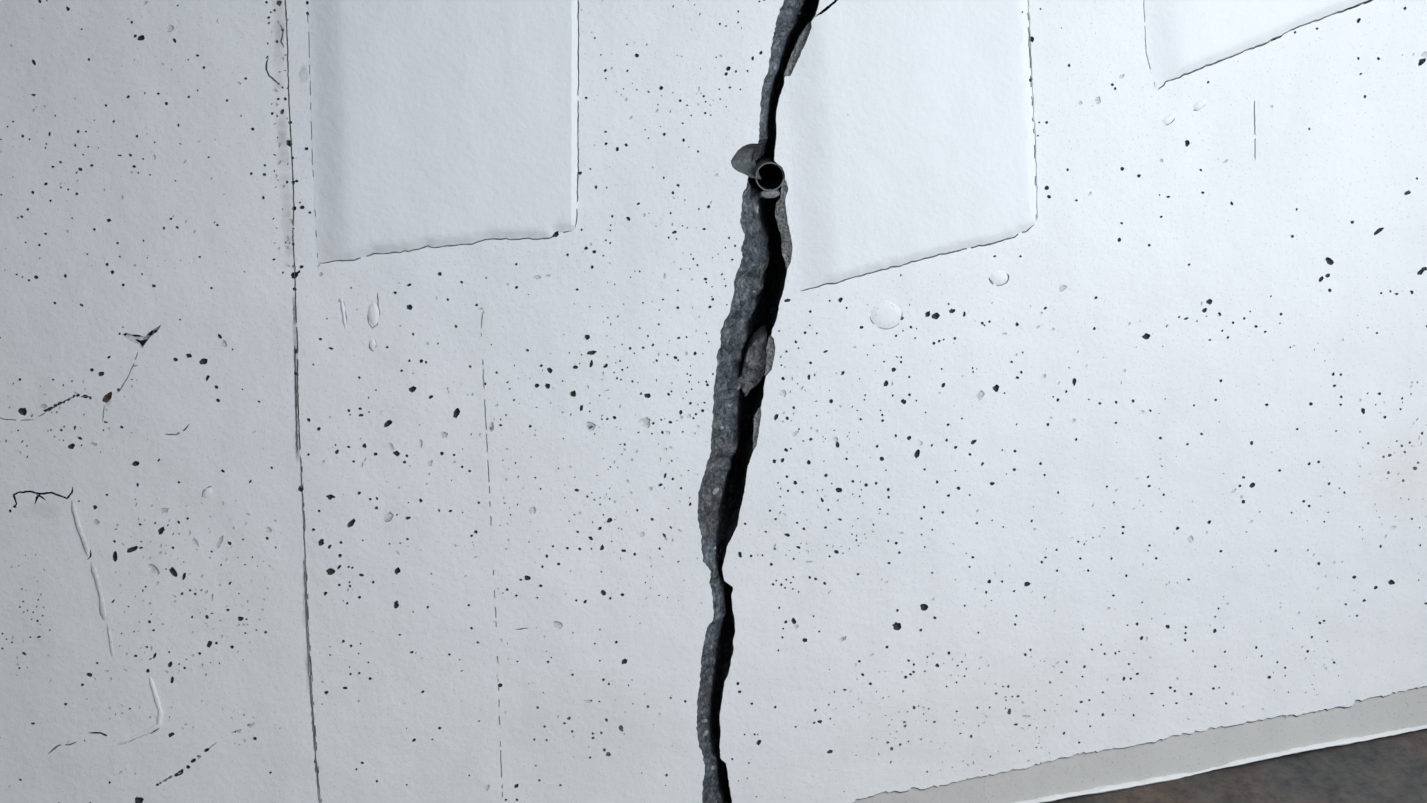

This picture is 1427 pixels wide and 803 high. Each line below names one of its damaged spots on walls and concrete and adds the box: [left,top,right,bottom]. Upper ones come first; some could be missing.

crack [696,0,838,803]